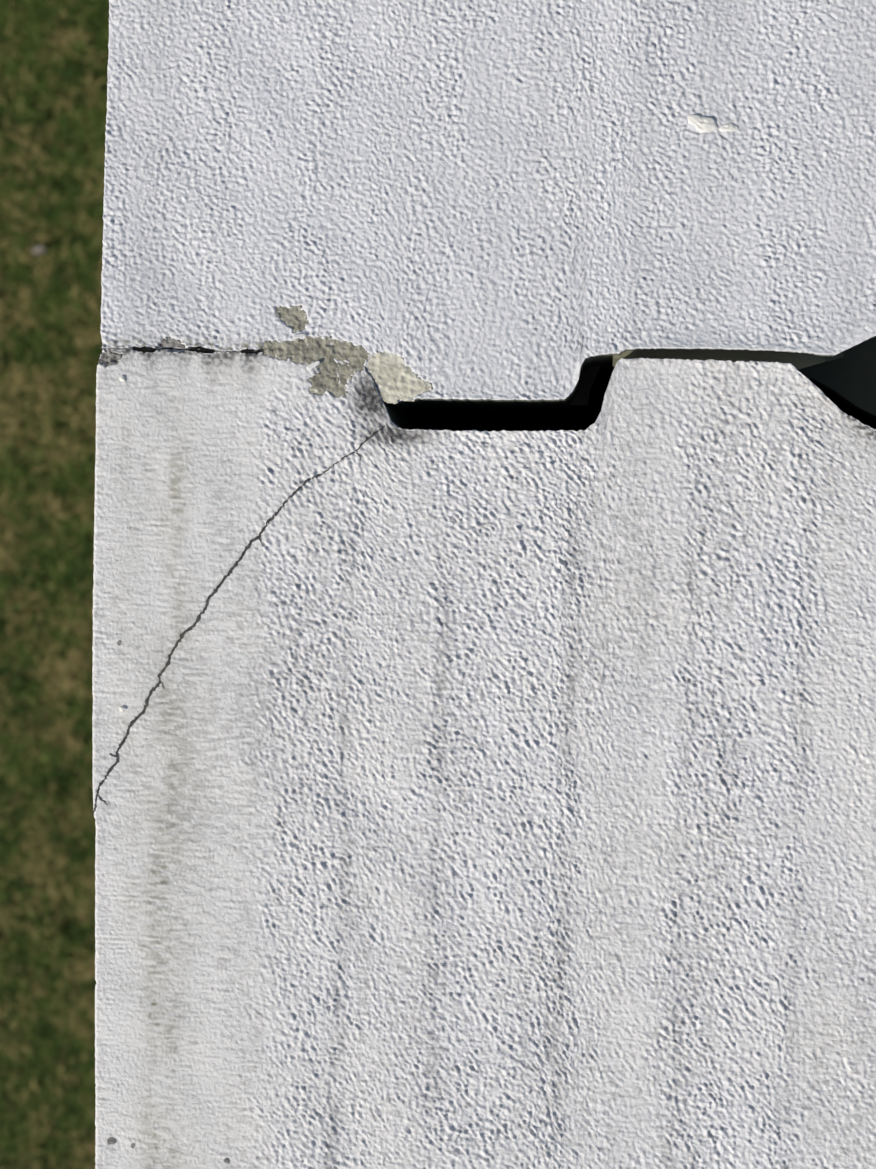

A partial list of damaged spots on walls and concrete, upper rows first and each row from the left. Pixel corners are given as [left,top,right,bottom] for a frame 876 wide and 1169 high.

spalling [261,305,433,404]
crack [92,426,385,816]